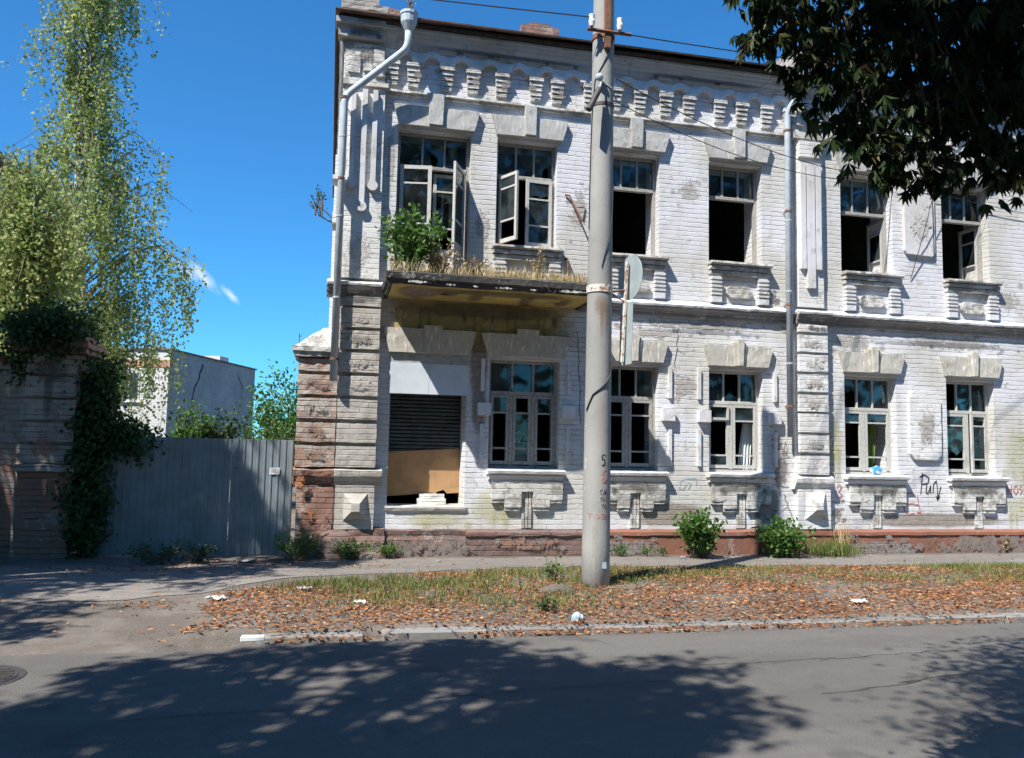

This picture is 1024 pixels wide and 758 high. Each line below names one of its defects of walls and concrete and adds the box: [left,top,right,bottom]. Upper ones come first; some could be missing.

spalling [294,473,328,542]